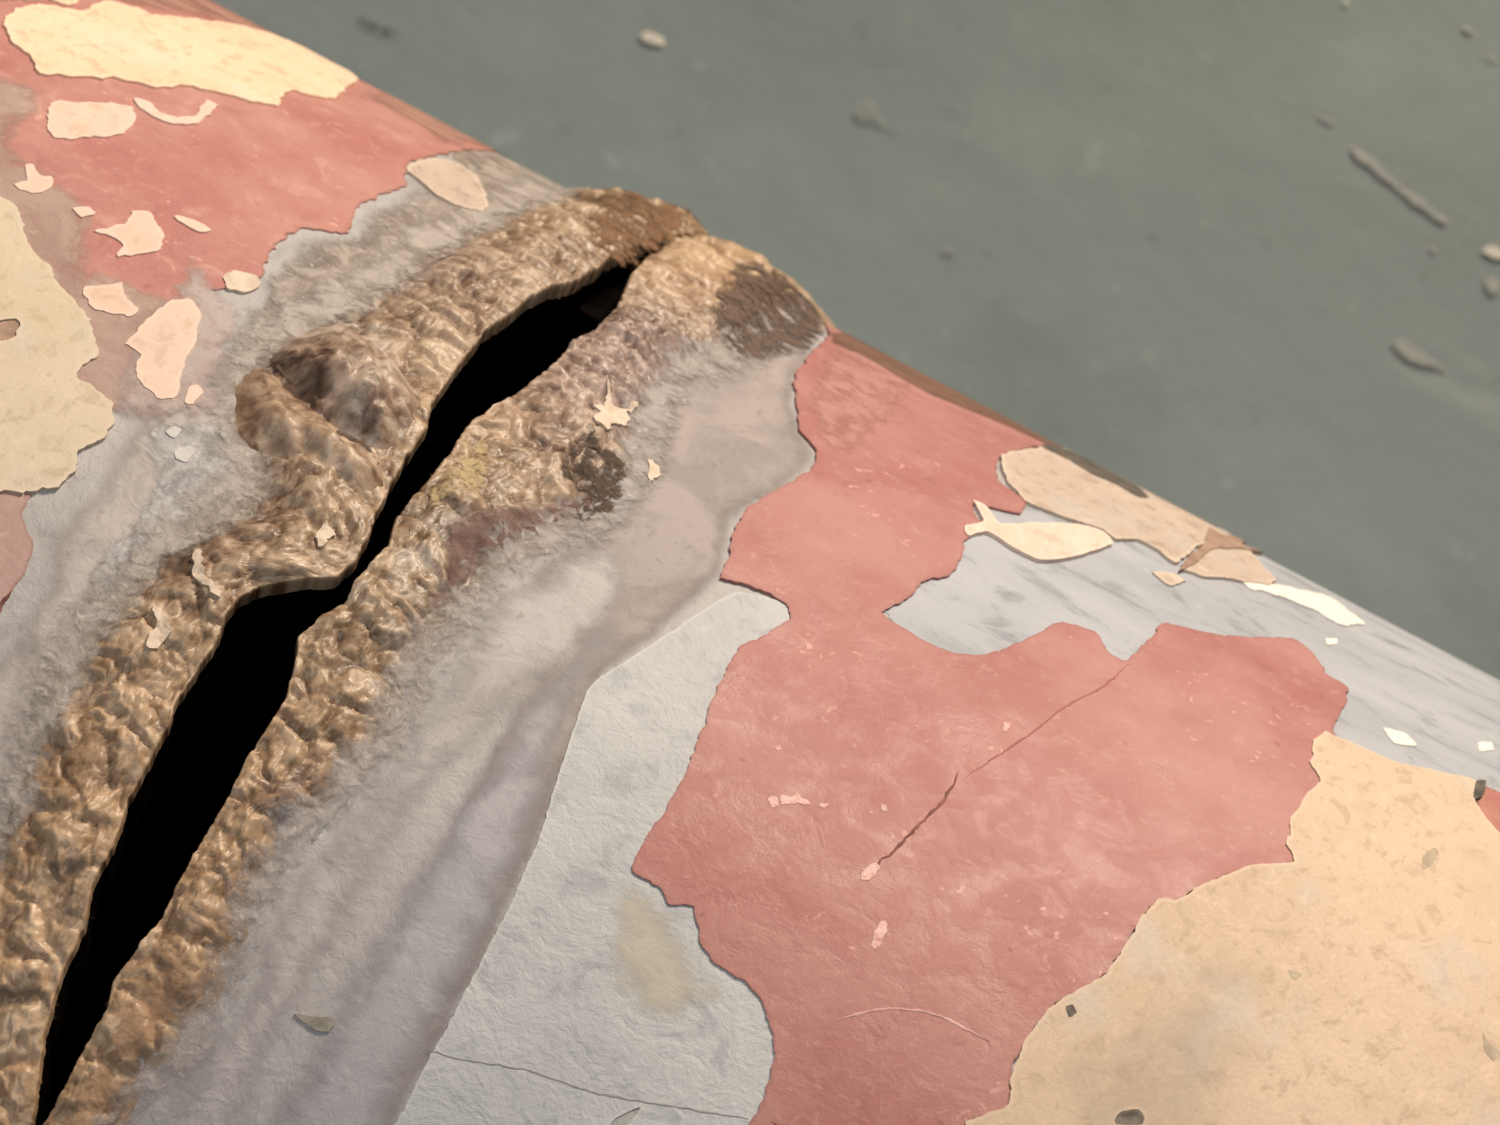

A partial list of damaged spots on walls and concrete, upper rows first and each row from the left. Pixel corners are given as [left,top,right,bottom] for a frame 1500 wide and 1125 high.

peeling [146,604,174,650]
peeling [0,0,498,602]
damp [0,150,575,869]
crack [36,249,658,1125]
damp [96,306,812,1125]
peeling [395,322,1500,1125]
crack [877,663,1131,865]